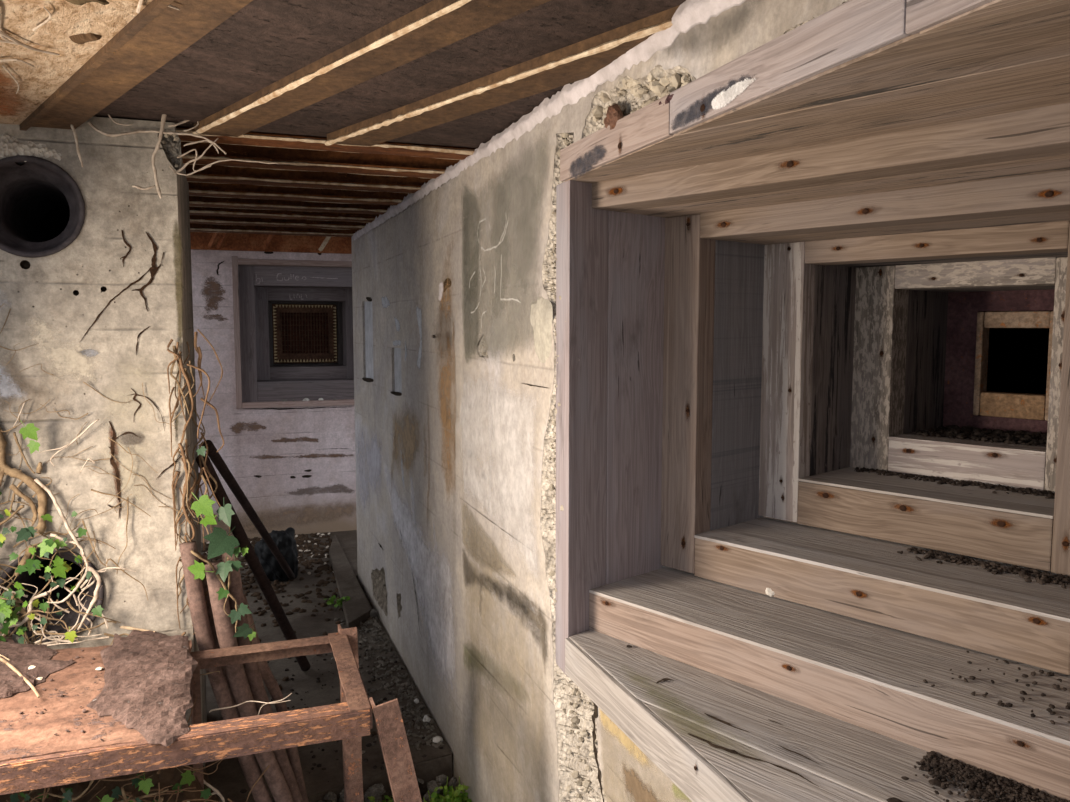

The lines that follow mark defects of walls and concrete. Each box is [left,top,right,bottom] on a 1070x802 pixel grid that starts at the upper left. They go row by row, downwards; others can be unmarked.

leakage [176,0,673,237]
leakage [463,145,545,354]
peeling [230,422,354,496]
corrosion [439,280,453,489]
spalling [530,64,696,802]
leakage [390,481,454,680]
leakage [462,551,547,657]
crack [591,702,611,802]
leakage [600,711,641,757]
leakage [623,767,657,802]